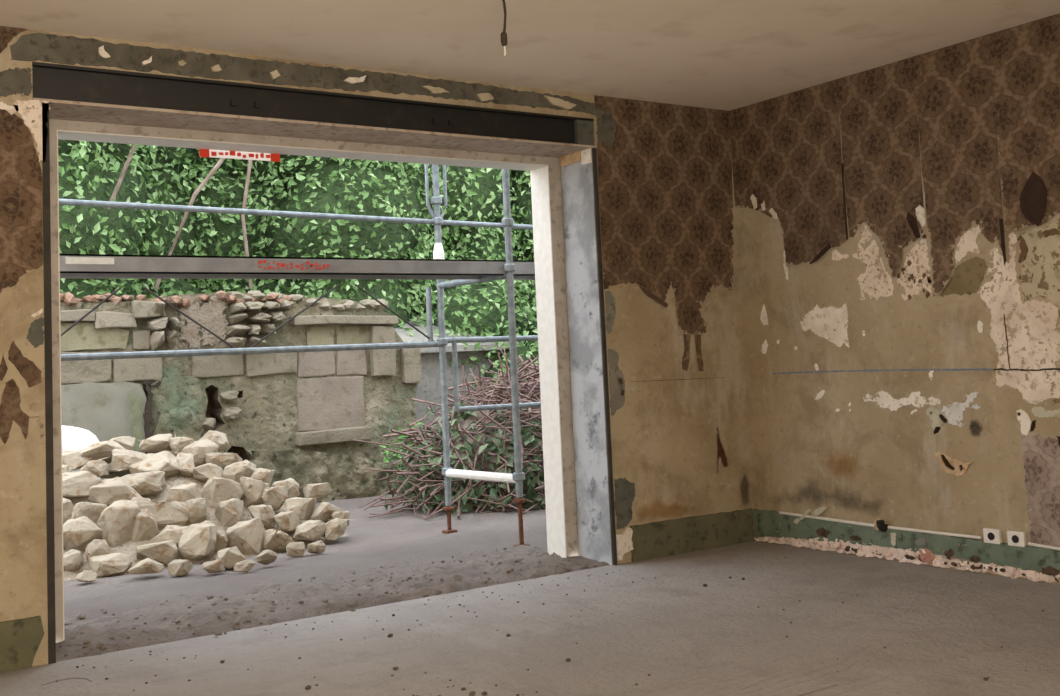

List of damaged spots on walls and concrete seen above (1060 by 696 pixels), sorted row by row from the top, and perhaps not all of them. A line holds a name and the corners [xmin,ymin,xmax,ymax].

peeling [0,100,50,162]
peeling [750,194,778,219]
peeling [760,304,768,325]
peeling [800,303,849,349]
peeling [831,205,1060,436]
flaking render [607,349,625,417]
flaking render [935,452,974,476]
flaking render [754,507,1060,583]